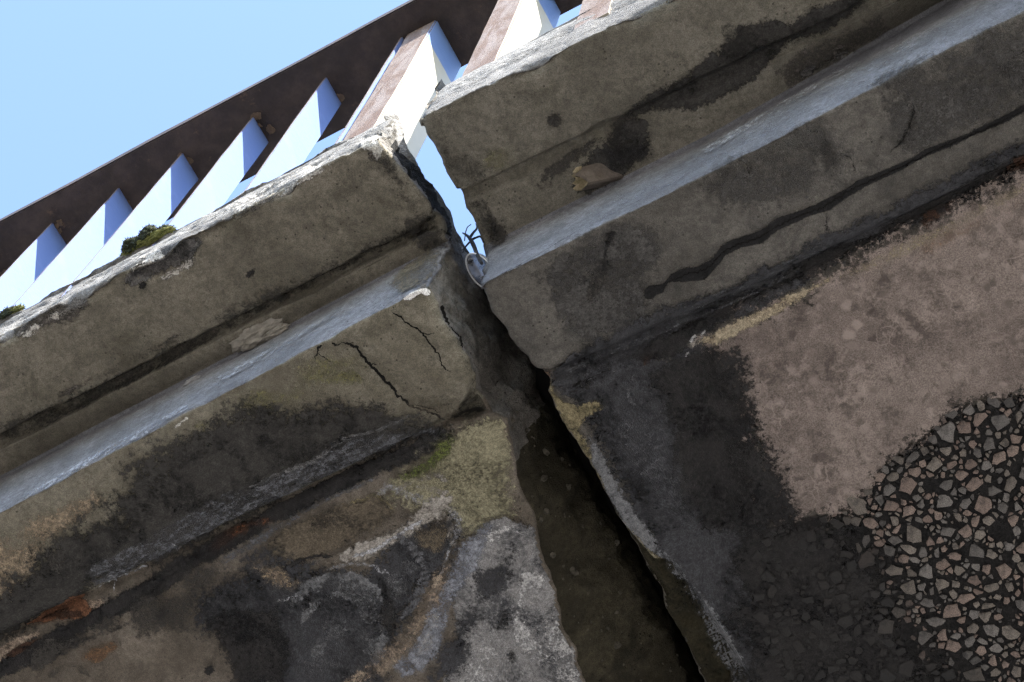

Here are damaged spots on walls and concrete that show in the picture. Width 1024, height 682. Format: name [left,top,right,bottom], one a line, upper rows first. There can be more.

leakage [537,0,865,195]
leakage [699,117,855,218]
crack [644,105,1024,300]
crack [314,342,449,420]
crack [392,305,463,372]
leakage [0,372,582,682]
rust [0,593,104,661]